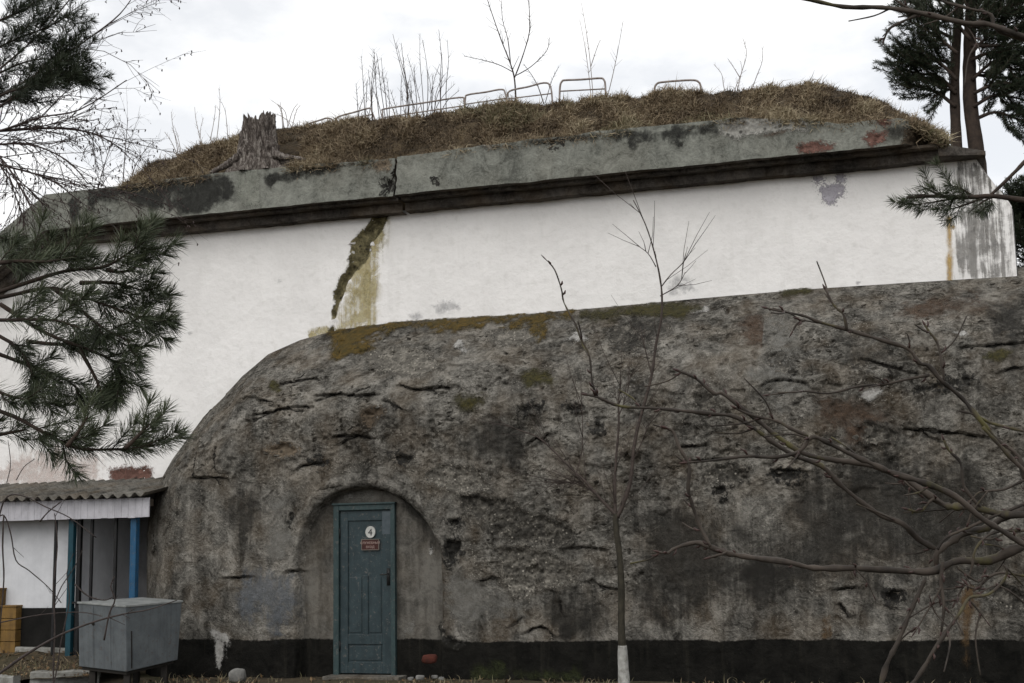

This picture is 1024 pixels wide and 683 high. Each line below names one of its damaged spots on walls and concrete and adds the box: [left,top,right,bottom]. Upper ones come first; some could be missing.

spalling [719,118,835,154]
spalling [862,119,891,148]
damp [68,163,337,221]
crack [328,162,396,332]
corrosion [947,218,955,280]
damp [956,162,1011,278]
damp [336,231,384,330]
crack [248,373,449,419]
crack [903,428,981,442]
damp [641,455,1007,626]